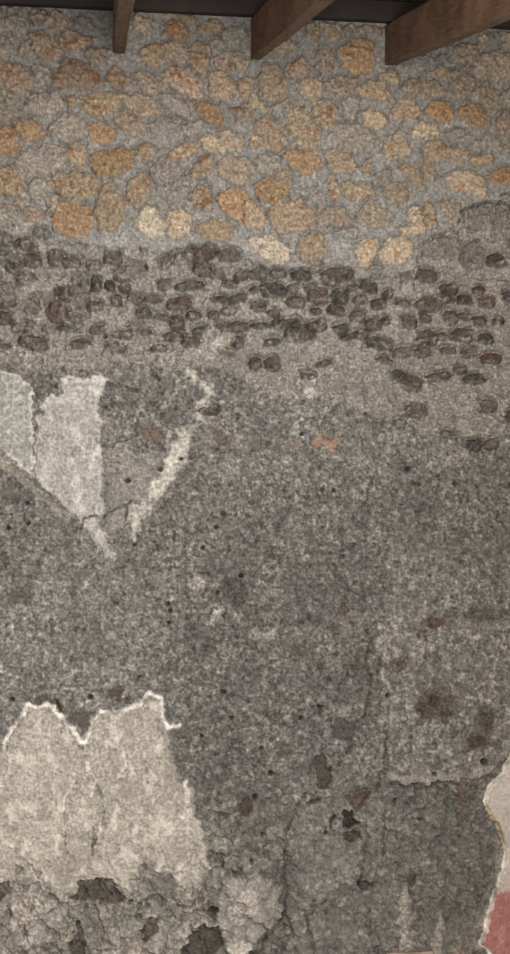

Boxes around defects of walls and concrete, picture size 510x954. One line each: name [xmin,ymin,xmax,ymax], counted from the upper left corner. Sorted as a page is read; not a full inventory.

flaking render [0,203,510,561]
crack [355,630,462,889]
spalling [68,920,88,954]
spalling [139,917,162,945]
spalling [181,907,226,954]
crack [249,792,320,954]
flaking render [478,753,510,954]